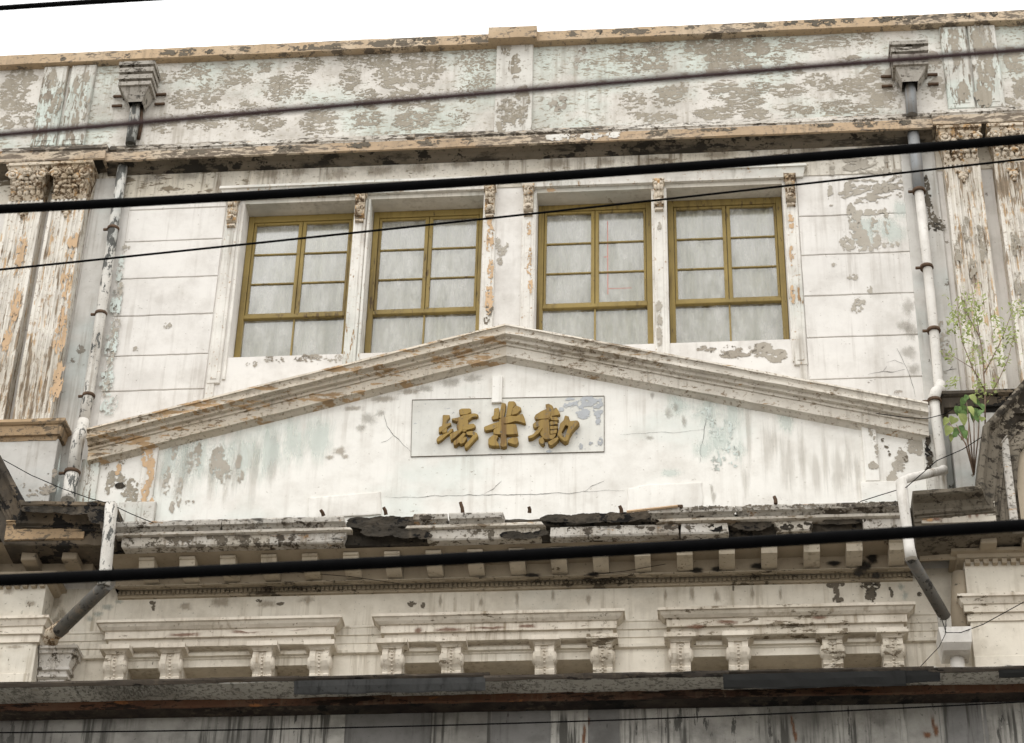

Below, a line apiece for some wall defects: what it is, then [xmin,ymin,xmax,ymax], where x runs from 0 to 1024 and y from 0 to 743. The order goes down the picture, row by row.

peeling [0,57,90,130]
peeling [150,35,495,152]
peeling [596,28,689,135]
peeling [684,12,1024,132]
peeling [545,132,620,141]
peeling [827,157,904,252]
peeling [924,175,946,231]
peeling [697,342,788,363]
peeling [20,442,244,533]
spalling [868,428,934,481]
spalling [347,516,433,539]
spalling [500,511,651,539]